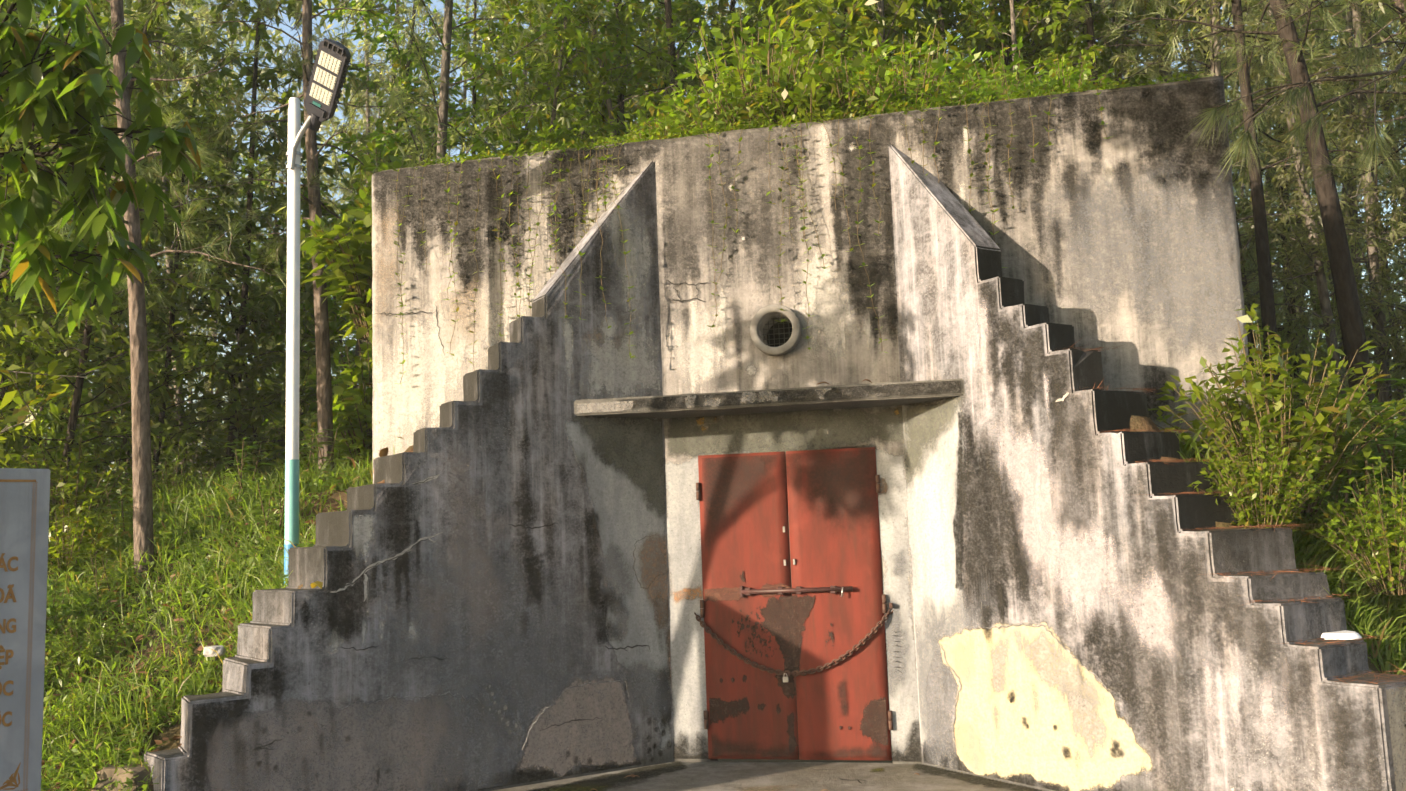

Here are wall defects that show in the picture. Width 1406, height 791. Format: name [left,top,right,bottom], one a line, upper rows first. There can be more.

water stain [798,197,896,350]
water stain [940,120,1243,356]
water stain [589,326,660,396]
water stain [575,417,666,517]
crack [328,532,443,601]
water stain [884,306,1195,791]
water stain [329,515,686,791]
flaking render [517,676,671,776]
rust [709,594,816,753]
rust [839,696,888,746]
flaking render [938,622,1152,791]
water stain [1257,629,1309,725]